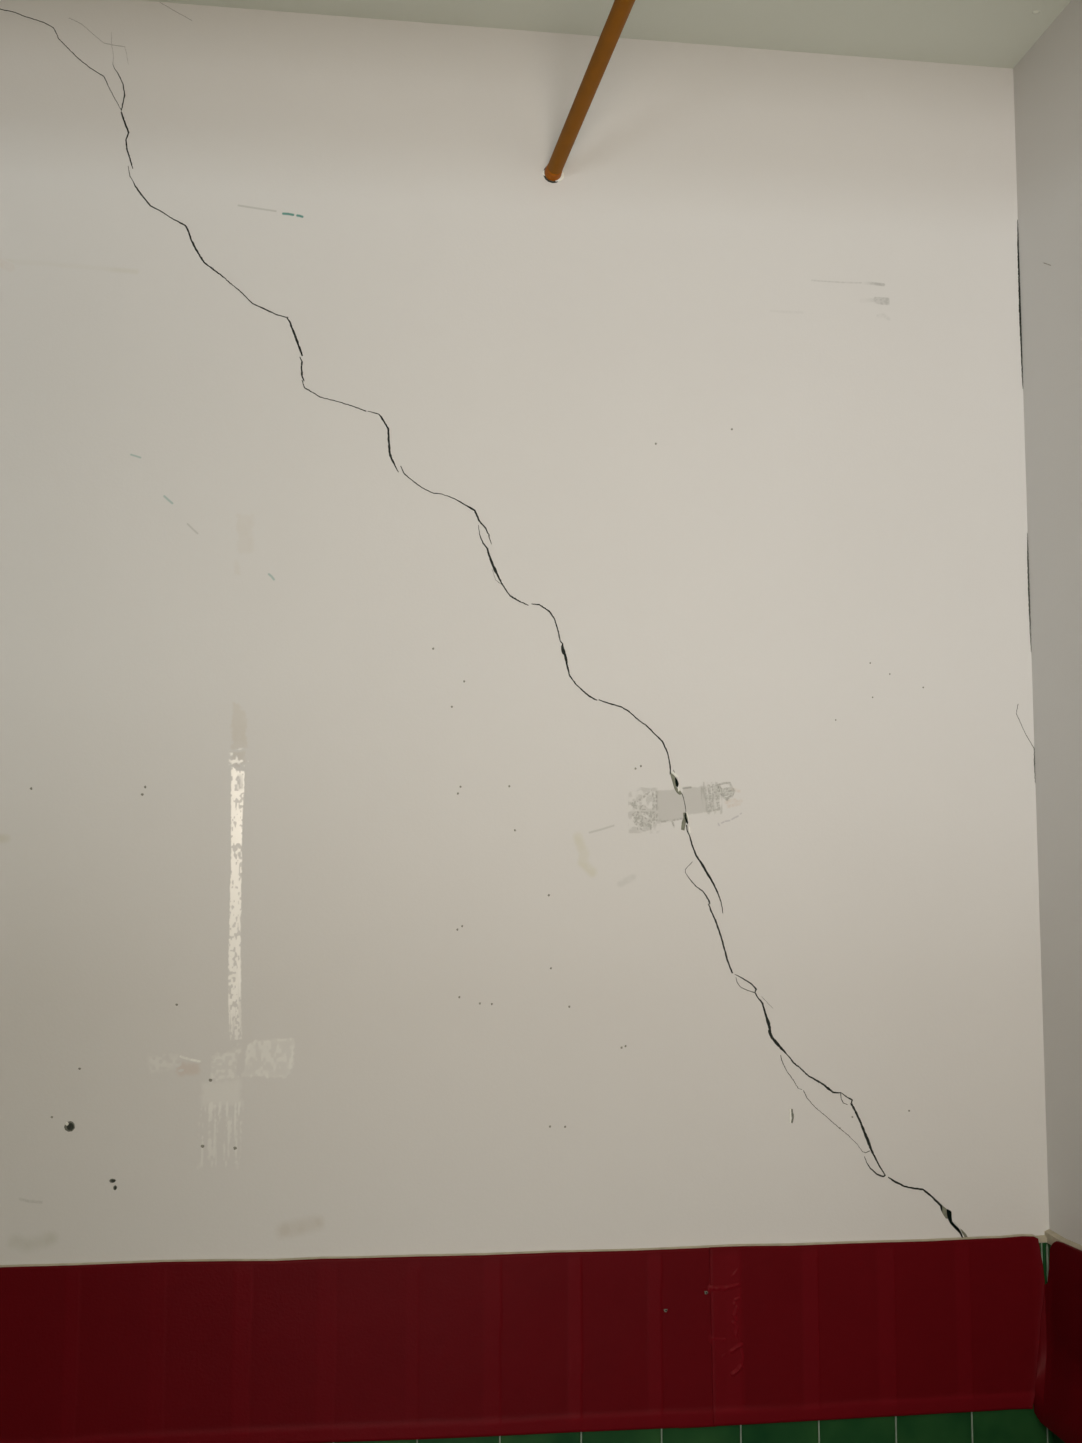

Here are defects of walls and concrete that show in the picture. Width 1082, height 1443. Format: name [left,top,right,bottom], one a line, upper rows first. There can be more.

crack [0,9,963,1236]
flaking render [670,772,682,795]
flaking render [681,812,691,834]